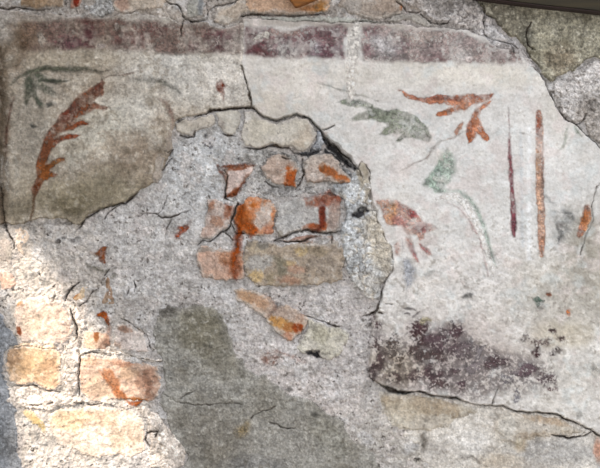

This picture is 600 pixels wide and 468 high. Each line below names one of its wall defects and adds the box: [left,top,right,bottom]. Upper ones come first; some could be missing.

crack [198,92,255,116]
spalling [0,226,30,264]
spalling [176,110,394,361]
spalling [102,277,115,304]
peeling [368,322,508,388]
peeling [521,329,565,358]
spalling [5,287,186,468]
peeling [501,363,554,391]
crack [528,412,596,439]